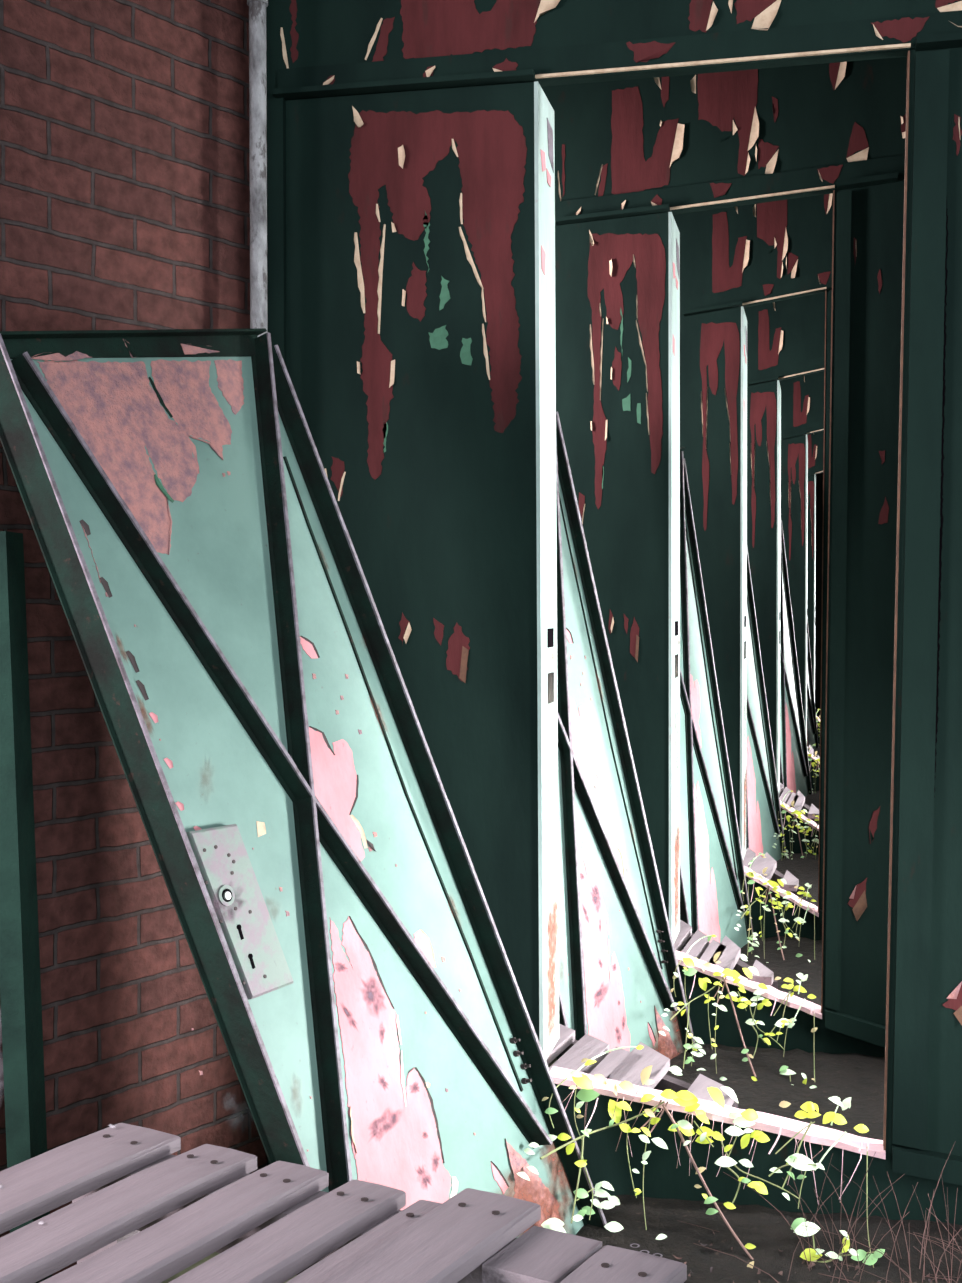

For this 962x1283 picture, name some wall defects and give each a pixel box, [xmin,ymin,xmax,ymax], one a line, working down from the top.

peeling [365,0,560,77]
peeling [688,0,781,32]
peeling [871,0,962,43]
peeling [348,106,566,479]
peeling [579,230,679,525]
peeling [595,69,817,560]
peeling [309,726,377,861]
peeling [566,628,607,801]
peeling [330,916,458,1210]
peeling [568,838,677,1057]
peeling [943,982,962,1025]
corrosion [507,1144,568,1234]